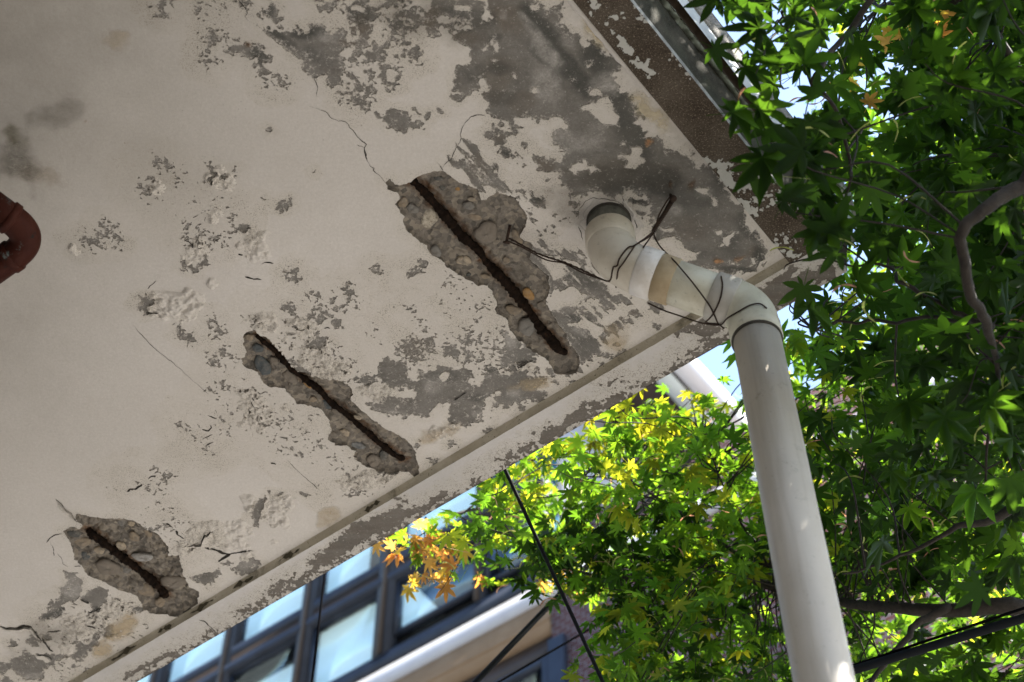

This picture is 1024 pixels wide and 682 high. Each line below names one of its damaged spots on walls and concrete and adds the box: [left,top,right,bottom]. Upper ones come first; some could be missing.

peeling [148,0,173,18]
crack [314,79,384,181]
peeling [137,152,188,204]
peeling [79,217,124,254]
peeling [172,0,838,497]
peeling [123,318,729,682]
crack [166,523,251,562]
spalling [0,465,261,682]
crack [0,600,101,660]